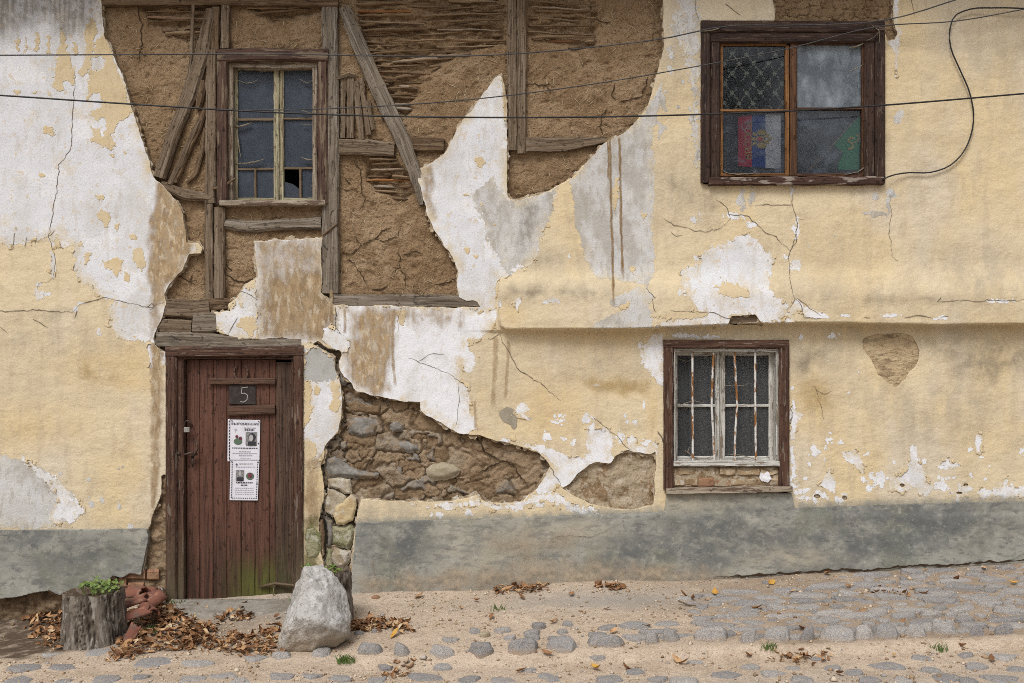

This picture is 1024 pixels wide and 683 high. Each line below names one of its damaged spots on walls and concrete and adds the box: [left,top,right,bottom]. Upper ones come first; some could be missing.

crack [3,76,164,331]
flaking render [0,0,850,577]
crack [666,186,821,319]
crack [490,333,557,397]
flaking render [863,333,919,387]
peeling [789,386,1024,505]